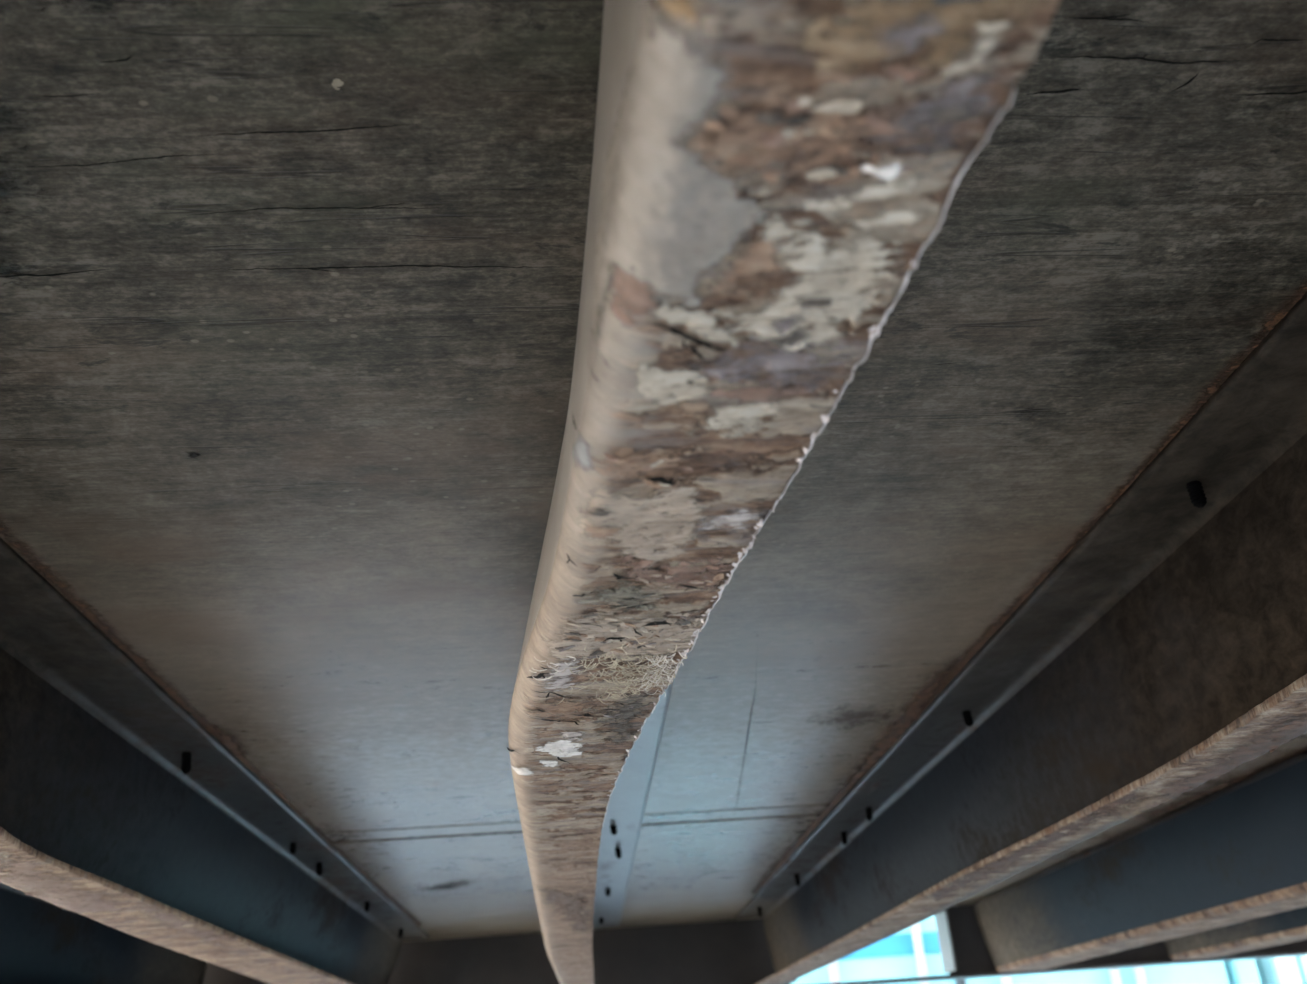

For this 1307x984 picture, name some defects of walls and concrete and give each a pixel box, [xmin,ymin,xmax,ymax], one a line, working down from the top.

crack [1076,14,1143,22]
crack [31,54,134,97]
crack [1023,88,1085,96]
crack [1054,39,1301,91]
crack [1247,88,1307,96]
crack [19,124,410,168]
crack [183,203,457,216]
crack [0,268,116,277]
crack [192,264,531,272]
peeling [544,0,1016,827]
peeling [511,731,583,775]
peeling [925,703,1307,901]